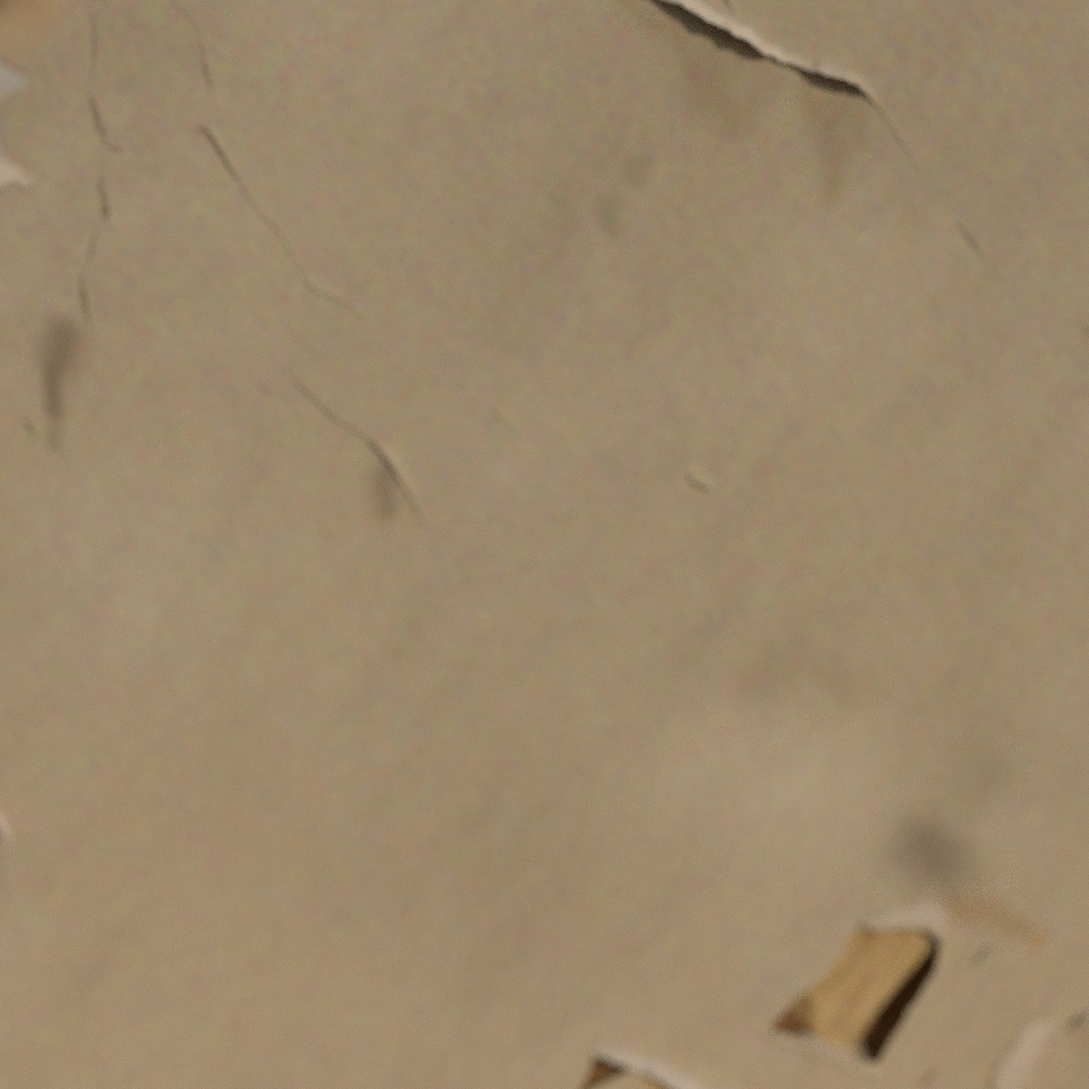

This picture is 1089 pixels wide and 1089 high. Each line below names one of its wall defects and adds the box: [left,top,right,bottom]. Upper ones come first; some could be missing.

crack [89,15,123,151]
crack [79,174,110,325]
crack [255,372,429,526]
peeling [581,1037,752,1089]
spalling [762,898,951,1080]
peeling [989,1012,1061,1089]